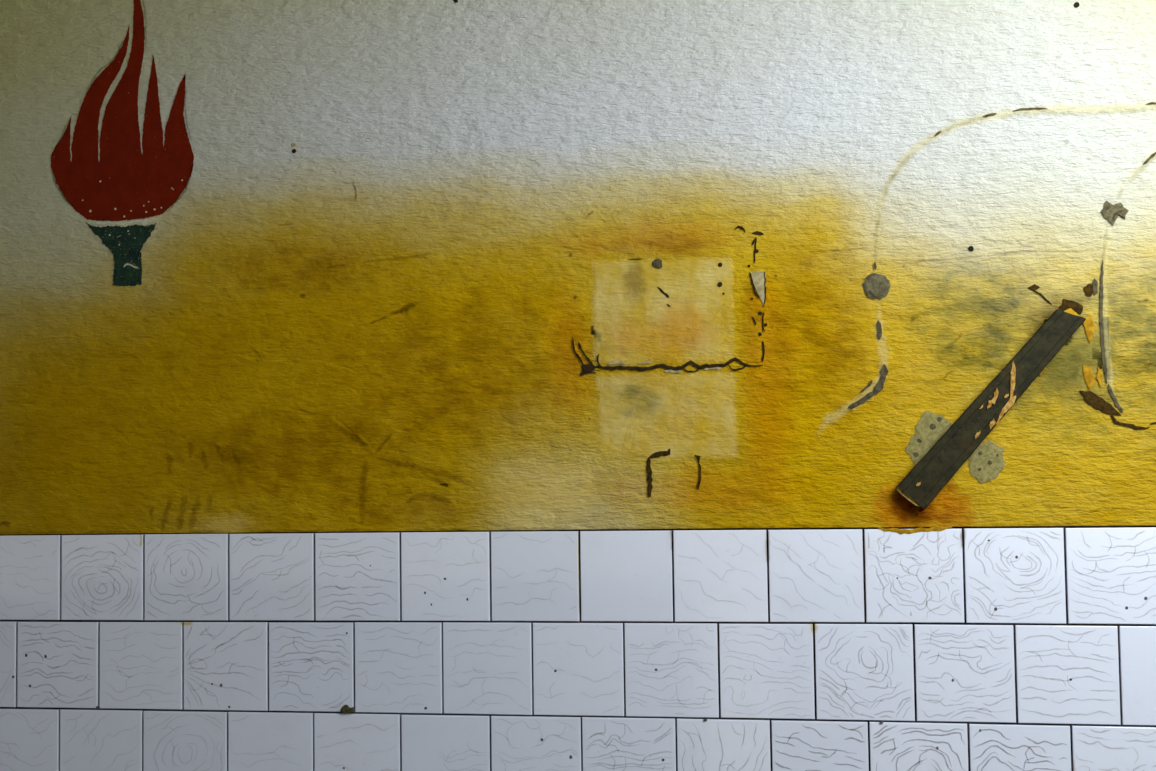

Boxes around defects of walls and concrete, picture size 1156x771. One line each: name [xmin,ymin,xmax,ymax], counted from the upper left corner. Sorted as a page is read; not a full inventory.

crack [572,231,767,376]